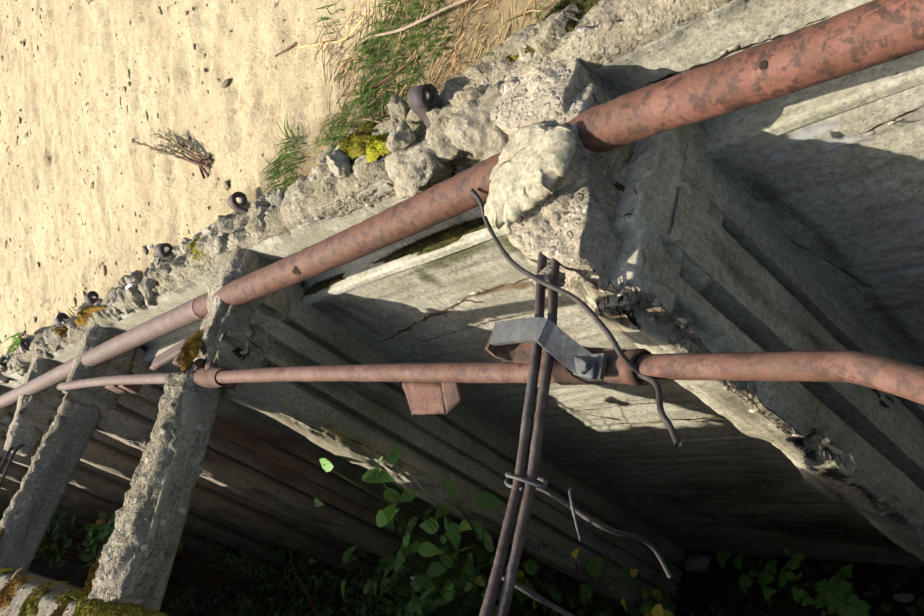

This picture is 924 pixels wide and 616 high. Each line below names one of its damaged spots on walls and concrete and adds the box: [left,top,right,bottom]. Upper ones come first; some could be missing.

crack [857,105,923,136]
spalling [311,183,395,221]
crack [380,278,578,347]
leakage [780,423,862,490]